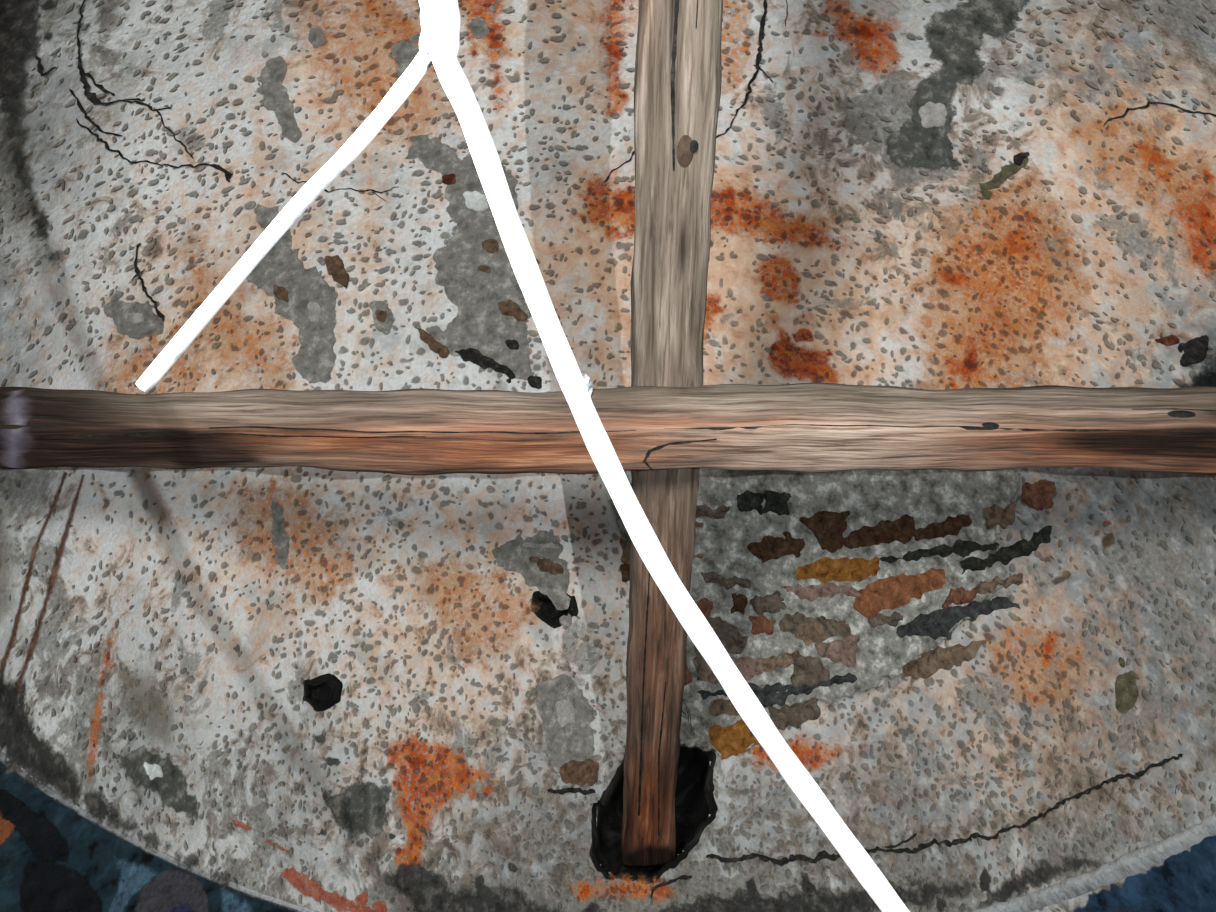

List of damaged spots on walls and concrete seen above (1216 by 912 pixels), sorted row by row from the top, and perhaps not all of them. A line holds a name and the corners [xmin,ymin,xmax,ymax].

crack [25,0,232,182]
crack [716,0,788,138]
crack [1104,101,1216,125]
rust [1071,104,1216,277]
rust [760,257,838,384]
rust [912,177,1090,390]
spalling [1155,335,1216,388]
spalling [608,498,632,582]
spalling [689,468,1056,731]
rust [387,734,496,866]
spalling [525,634,760,884]
crack [651,753,1183,898]